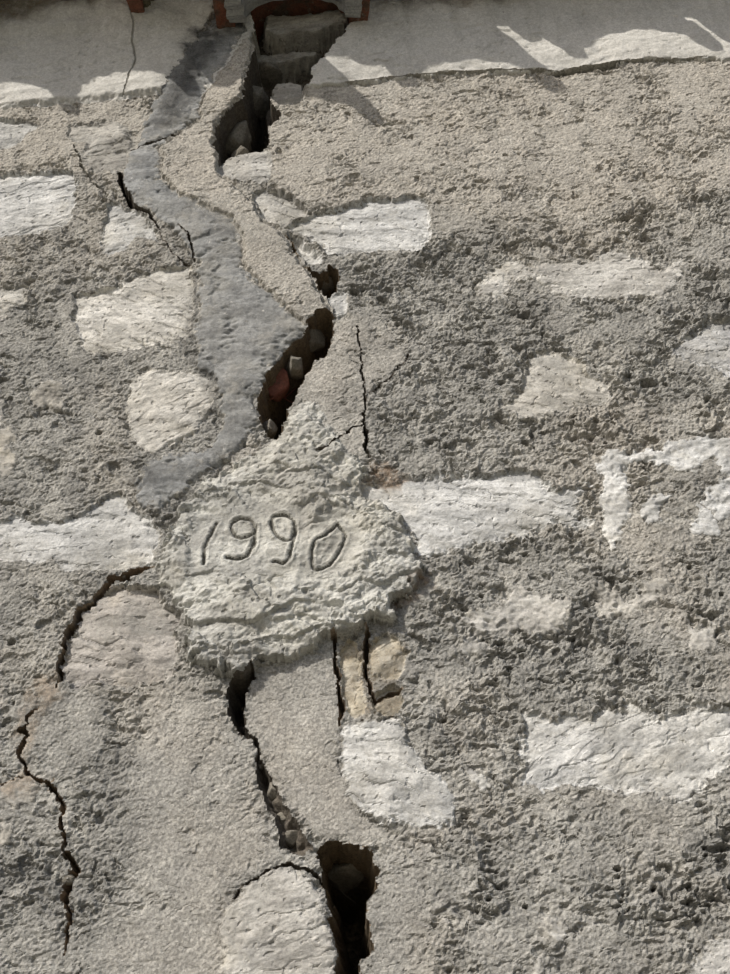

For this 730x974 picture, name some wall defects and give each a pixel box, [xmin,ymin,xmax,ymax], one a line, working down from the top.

crack [122,5,136,96]
crack [130,134,179,151]
crack [212,14,350,167]
crack [72,144,196,267]
crack [256,235,409,458]
crack [54,566,155,689]
crack [330,622,403,726]
crack [0,706,81,956]
crack [226,659,323,900]